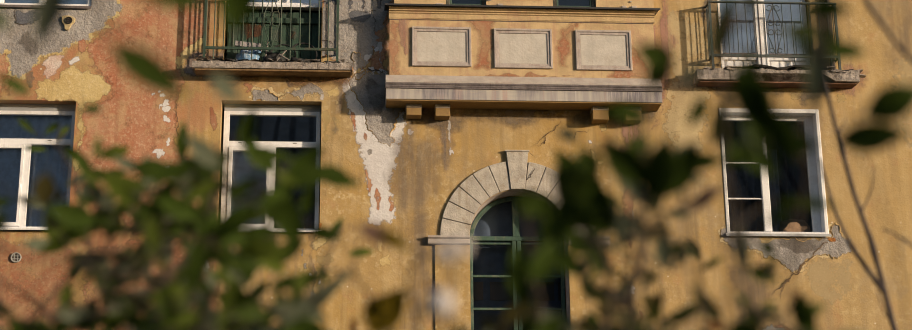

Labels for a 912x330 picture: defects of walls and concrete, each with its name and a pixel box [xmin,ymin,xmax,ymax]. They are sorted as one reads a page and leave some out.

peeling [0,0,209,179]
flaking render [244,0,414,225]
crack [526,121,589,180]
flaking render [747,223,852,273]
crack [774,242,828,299]